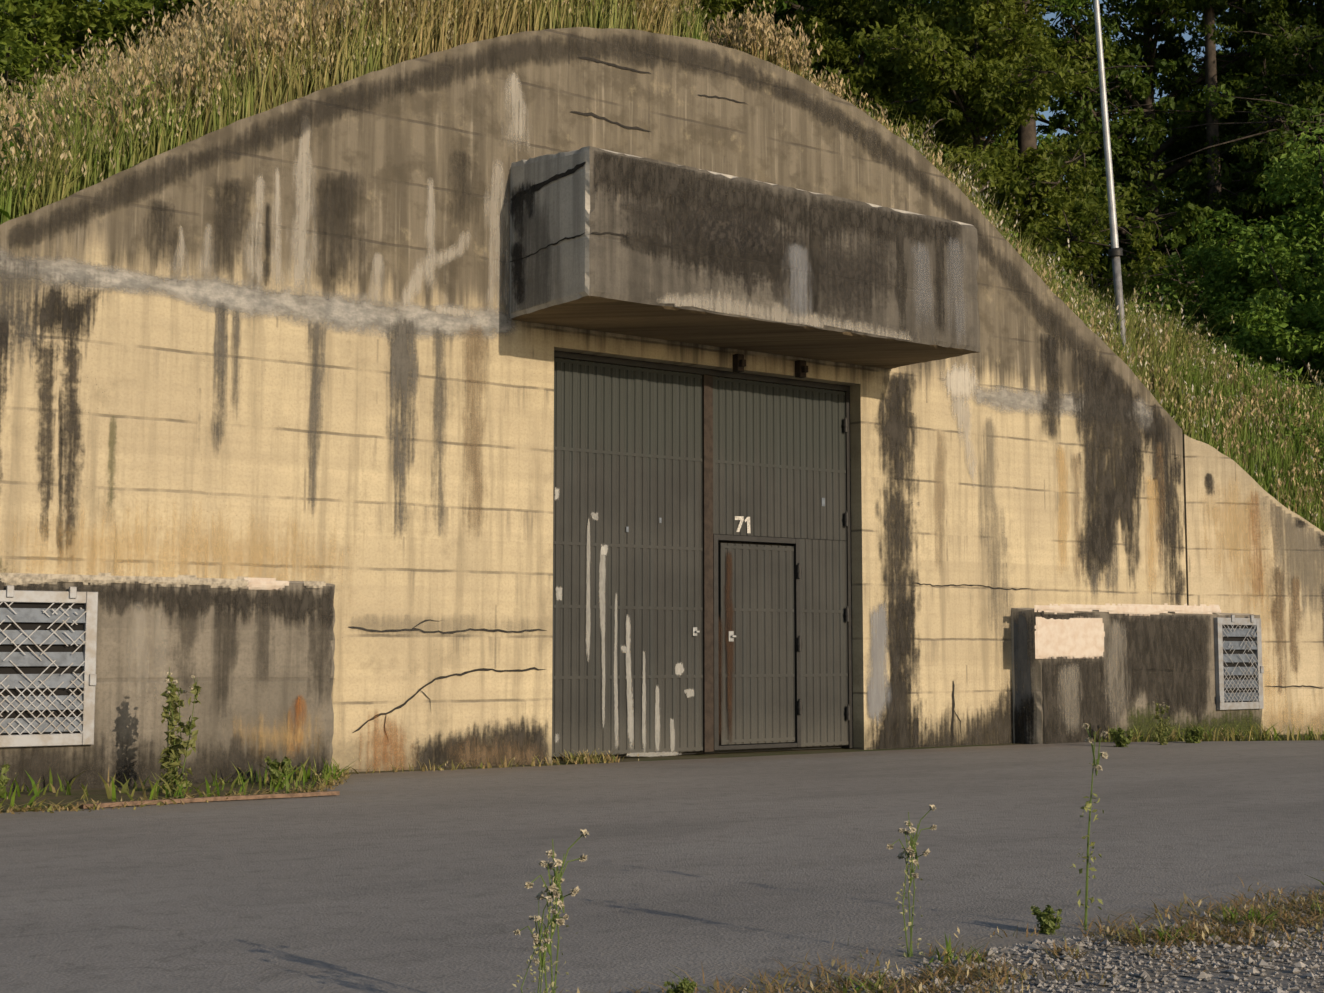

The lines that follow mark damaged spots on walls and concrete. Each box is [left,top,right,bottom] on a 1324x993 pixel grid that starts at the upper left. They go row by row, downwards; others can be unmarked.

water stain [0,36,1211,749]
water stain [1205,473,1213,493]
crack [349,619,547,634]
water stain [1272,568,1300,688]
crack [352,667,545,742]